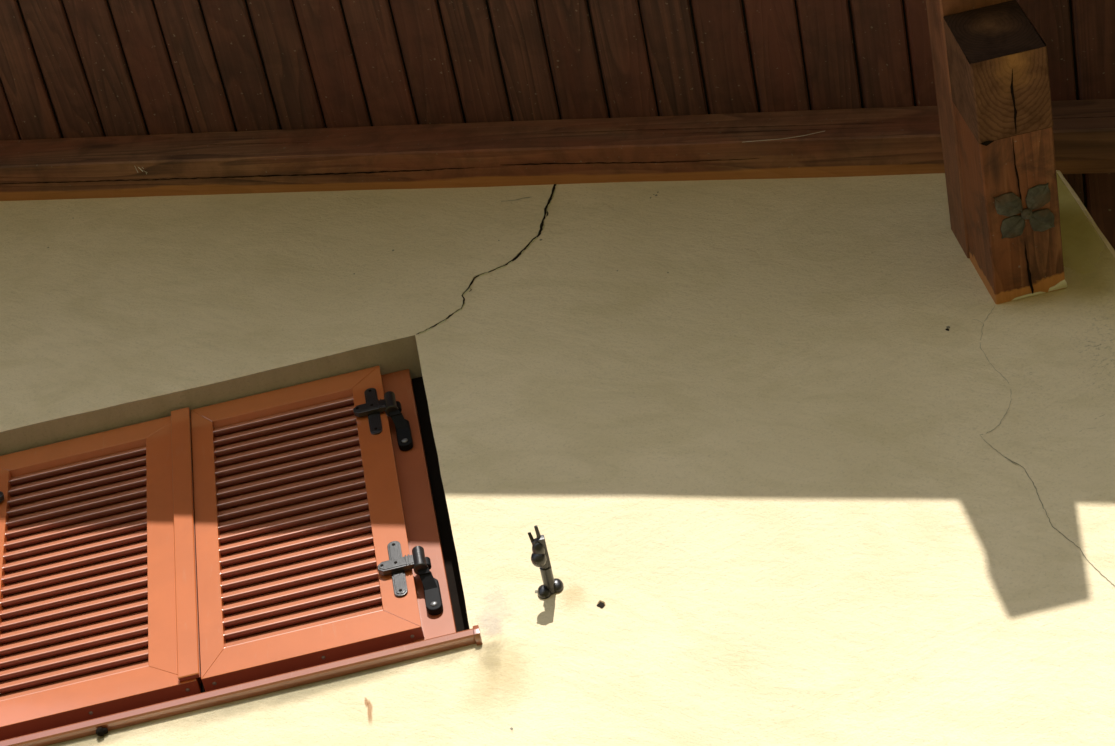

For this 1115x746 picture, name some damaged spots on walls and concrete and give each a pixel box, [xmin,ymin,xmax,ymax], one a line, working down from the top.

crack [416,122,896,335]
crack [973,306,1115,586]